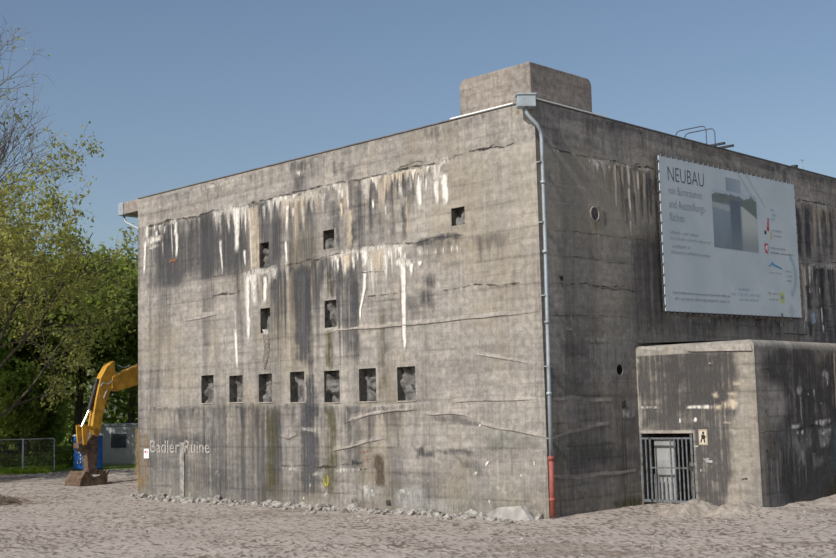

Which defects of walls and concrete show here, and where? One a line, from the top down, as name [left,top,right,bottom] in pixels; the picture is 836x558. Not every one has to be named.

crack [147,159,450,227]
damp [365,158,448,233]
crack [469,143,513,152]
crack [549,146,654,170]
damp [143,184,458,365]
crack [559,282,634,292]
damp [589,159,660,324]
damp [796,203,836,336]
damp [289,374,345,499]